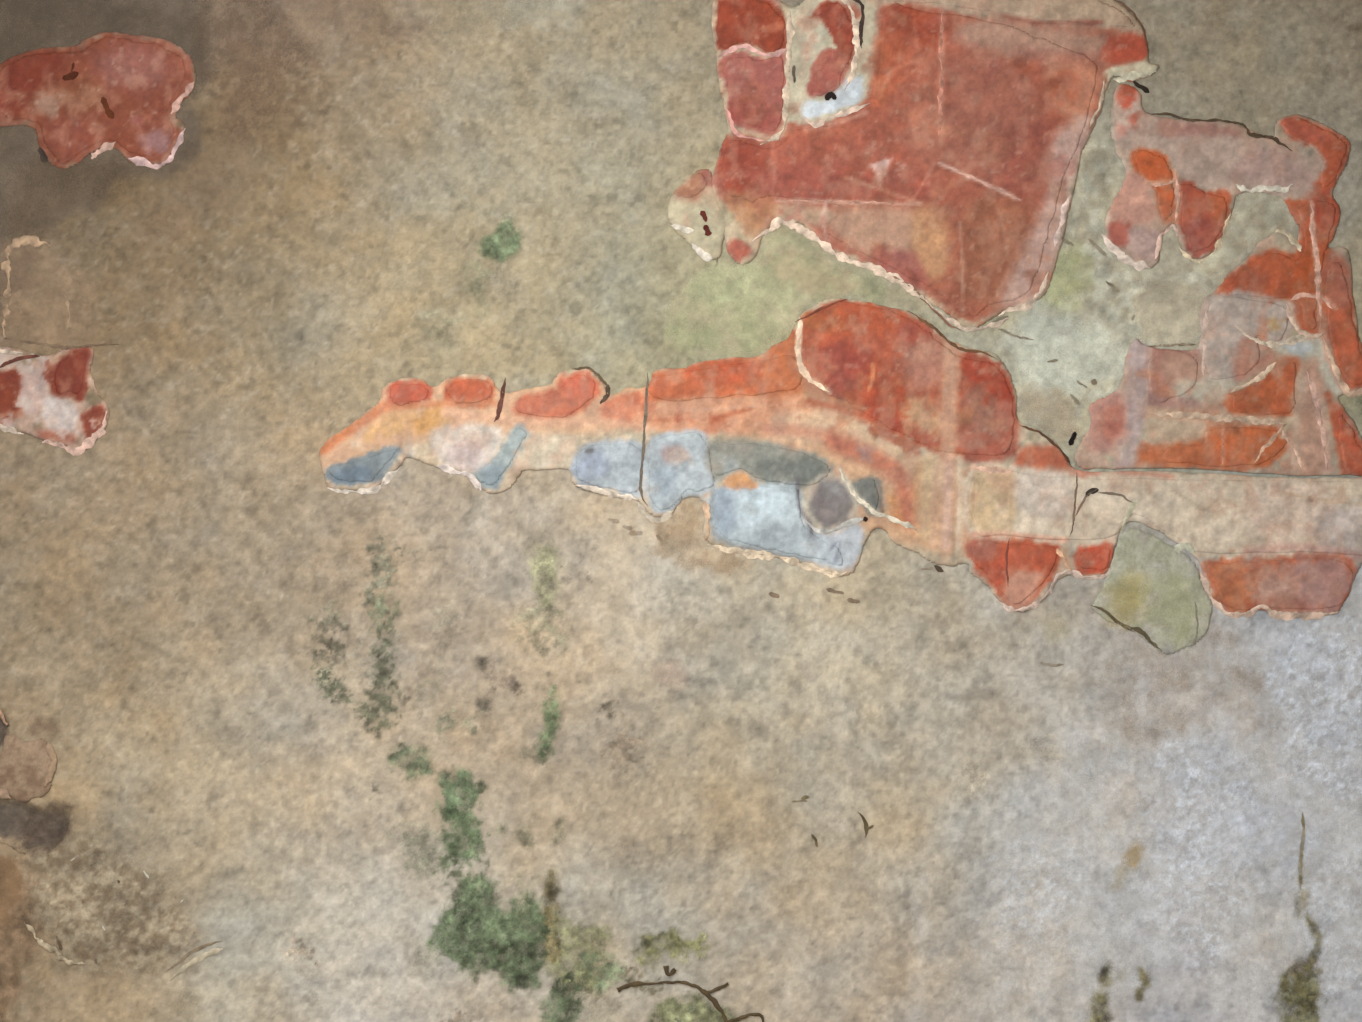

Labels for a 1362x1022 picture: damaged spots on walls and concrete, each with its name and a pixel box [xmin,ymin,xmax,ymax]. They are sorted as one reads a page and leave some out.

water stain [0,0,212,90]
water stain [0,104,201,252]
peeling [1,235,119,350]
spalling [609,501,740,572]
spalling [826,588,860,603]